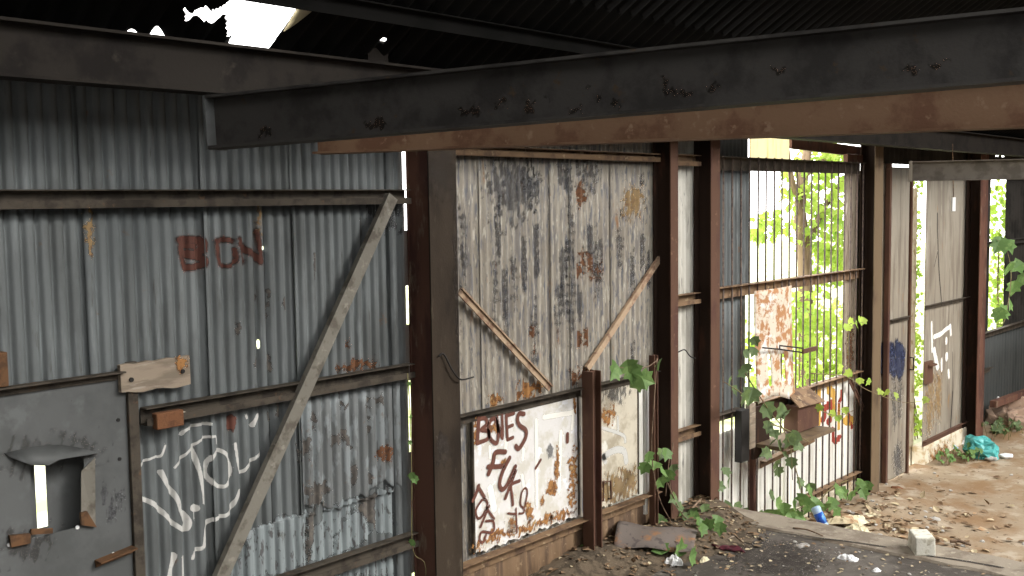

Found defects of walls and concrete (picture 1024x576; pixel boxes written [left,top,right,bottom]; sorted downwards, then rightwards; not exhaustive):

rust [575,181,588,209]
rust [620,184,647,222]
water stain [492,196,540,363]
water stain [554,168,603,347]
rust [576,248,604,281]
water stain [617,211,650,290]
rust [754,285,795,405]
rust [516,378,543,401]
rust [601,403,616,426]
peeling [231,465,395,576]
rust [472,444,580,552]
rust [602,466,638,503]